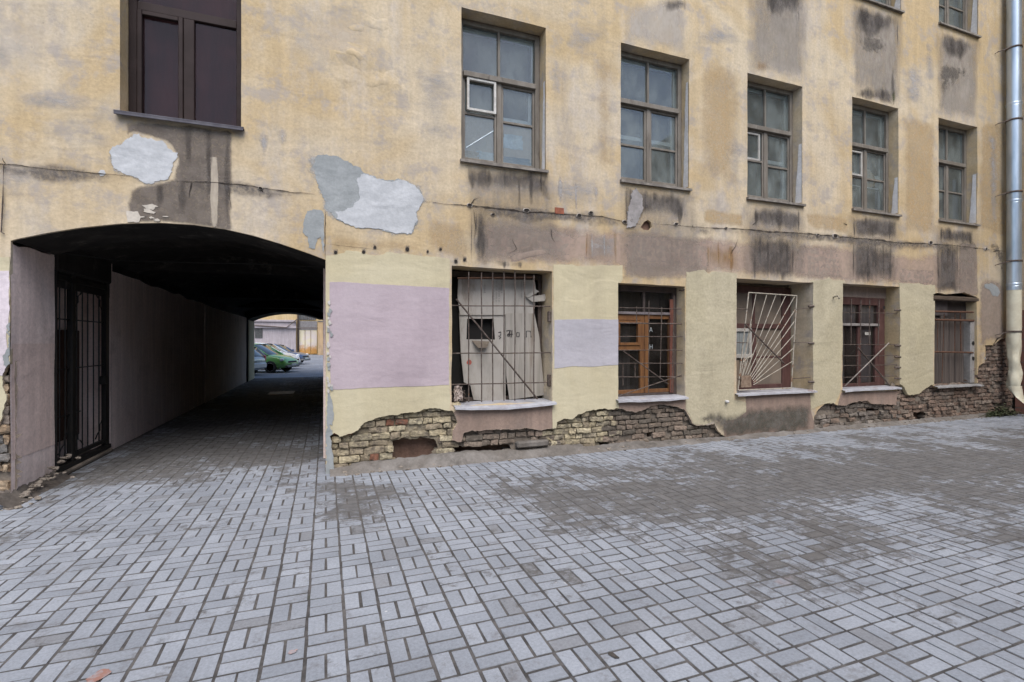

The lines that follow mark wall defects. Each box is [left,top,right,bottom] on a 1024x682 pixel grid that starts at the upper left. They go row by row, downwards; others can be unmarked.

leakage [859,9,898,50]
leakage [864,80,895,101]
leakage [128,123,231,229]
leakage [471,170,545,193]
leakage [626,191,682,219]
leakage [755,211,799,228]
leakage [753,239,793,278]
leakage [853,220,895,277]
leakage [938,230,971,290]
spalling [326,300,723,468]
spalling [814,338,1015,428]
spalling [0,361,22,493]